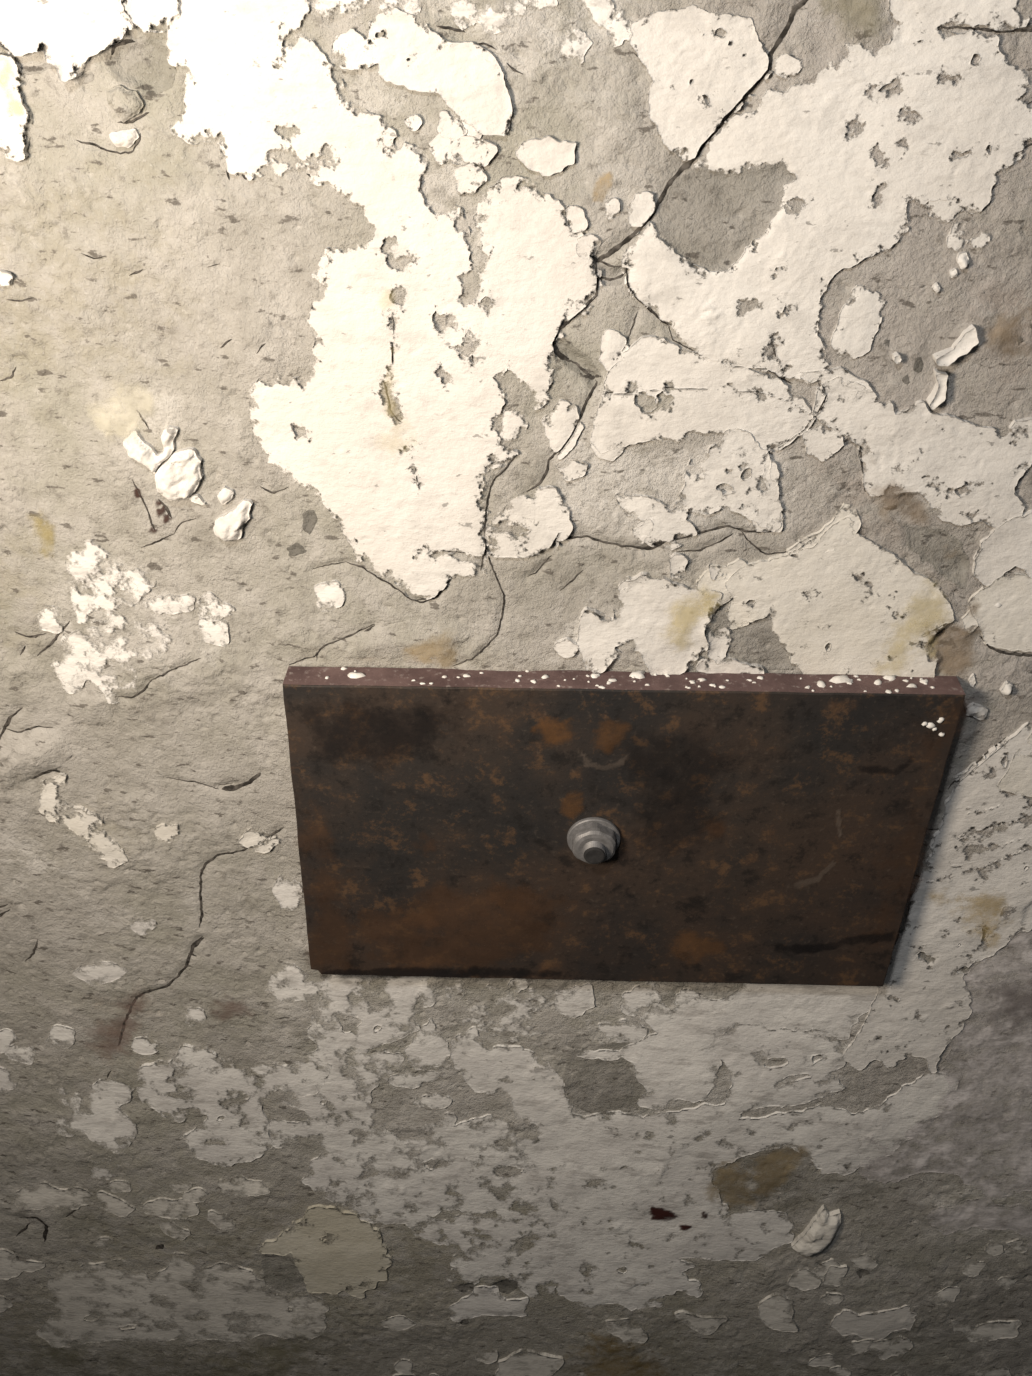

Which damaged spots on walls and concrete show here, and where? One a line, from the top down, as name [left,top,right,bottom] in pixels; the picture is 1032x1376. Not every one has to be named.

peeling [0,0,1032,678]
crack [313,0,811,666]
crack [730,338,826,450]
peeling [38,539,235,704]
crack [107,827,284,1078]
peeling [0,722,1032,1348]
peeling [392,1358,440,1376]
peeling [475,1349,564,1376]
peeling [758,1253,917,1376]